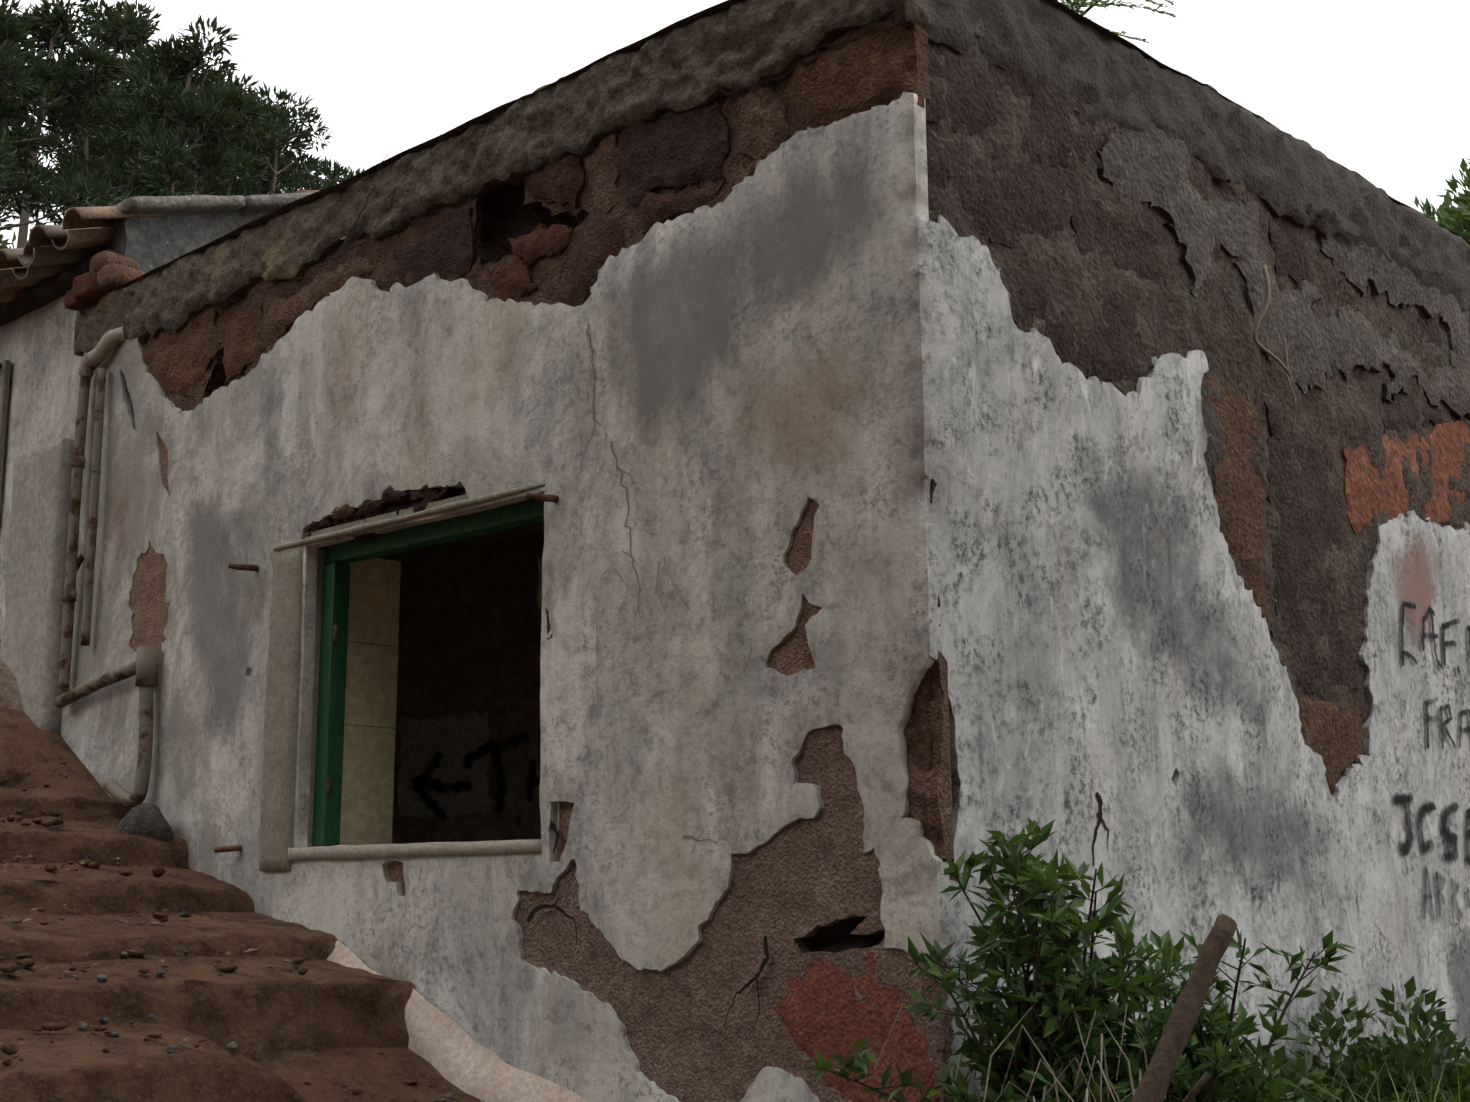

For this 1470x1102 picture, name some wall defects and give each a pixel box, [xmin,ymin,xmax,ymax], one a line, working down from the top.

peeling [130,543,170,658]
peeling [396,711,493,820]
crack [572,323,654,705]
flaking render [515,725,955,1102]
peeling [145,16,1470,795]
spalling [904,649,955,861]